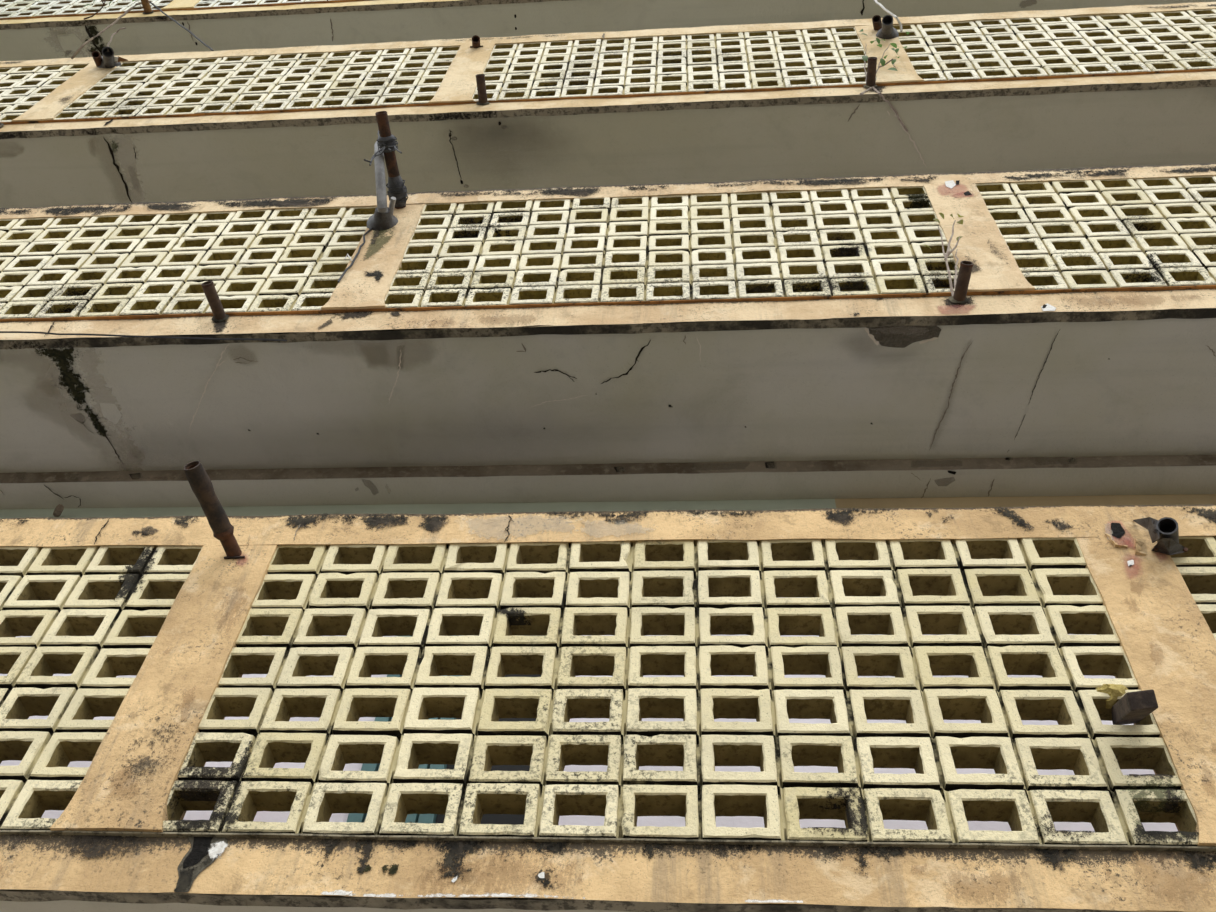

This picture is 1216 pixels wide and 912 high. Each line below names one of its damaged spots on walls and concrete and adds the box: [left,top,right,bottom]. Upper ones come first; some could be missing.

crack [104,119,136,203]
crack [517,338,651,384]
flaking render [864,326,941,348]
crack [35,322,123,463]
crack [930,343,972,449]
crack [1007,330,1060,453]
damp [114,515,199,605]
damp [63,835,143,862]
damp [314,822,488,879]
damp [528,842,572,861]
damp [641,843,671,861]
damp [687,844,760,856]